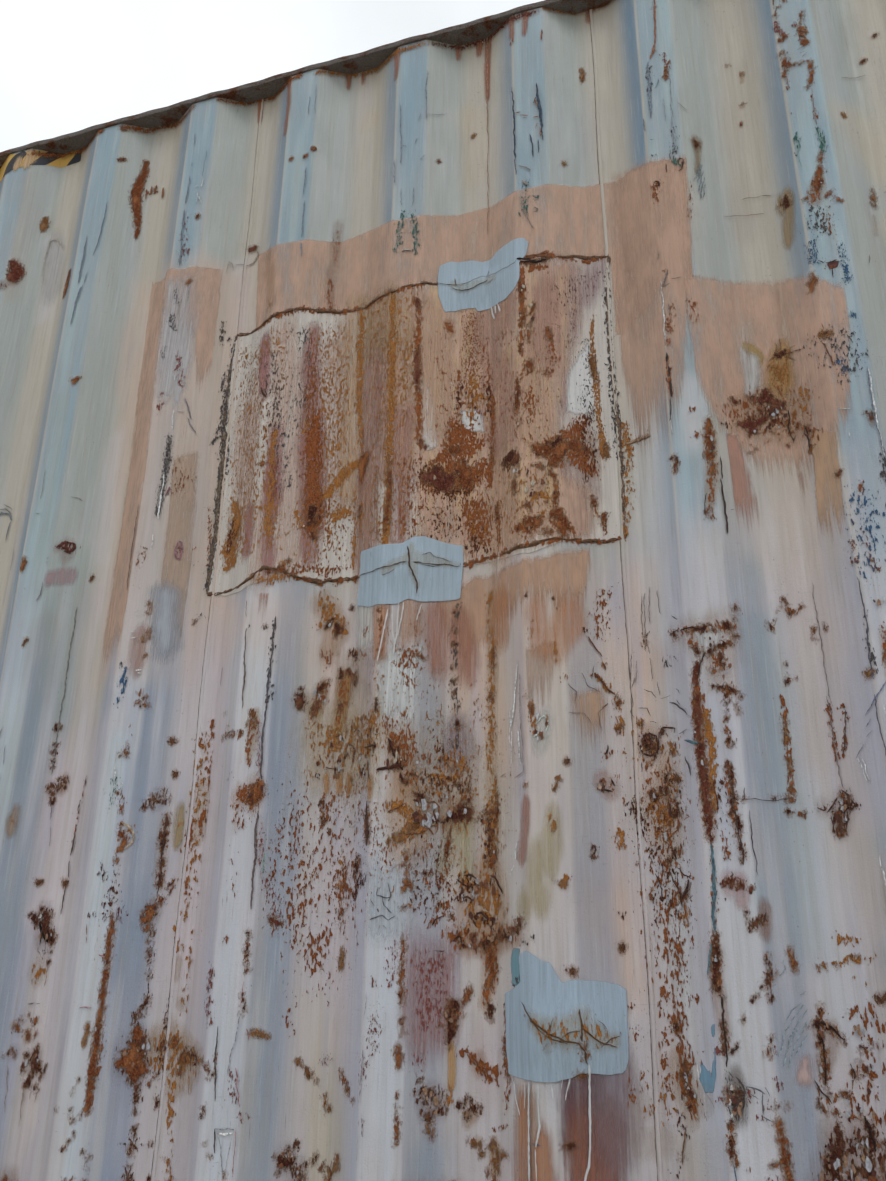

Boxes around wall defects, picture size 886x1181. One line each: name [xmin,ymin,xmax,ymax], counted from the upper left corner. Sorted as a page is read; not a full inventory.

corrosion [120,105,194,133]
corrosion [217,0,613,135]
corrosion [778,11,821,126]
corrosion [129,159,164,240]
corrosion [1,260,27,288]
corrosion [835,447,886,585]
corrosion [862,621,886,681]
corrosion [54,251,861,1181]